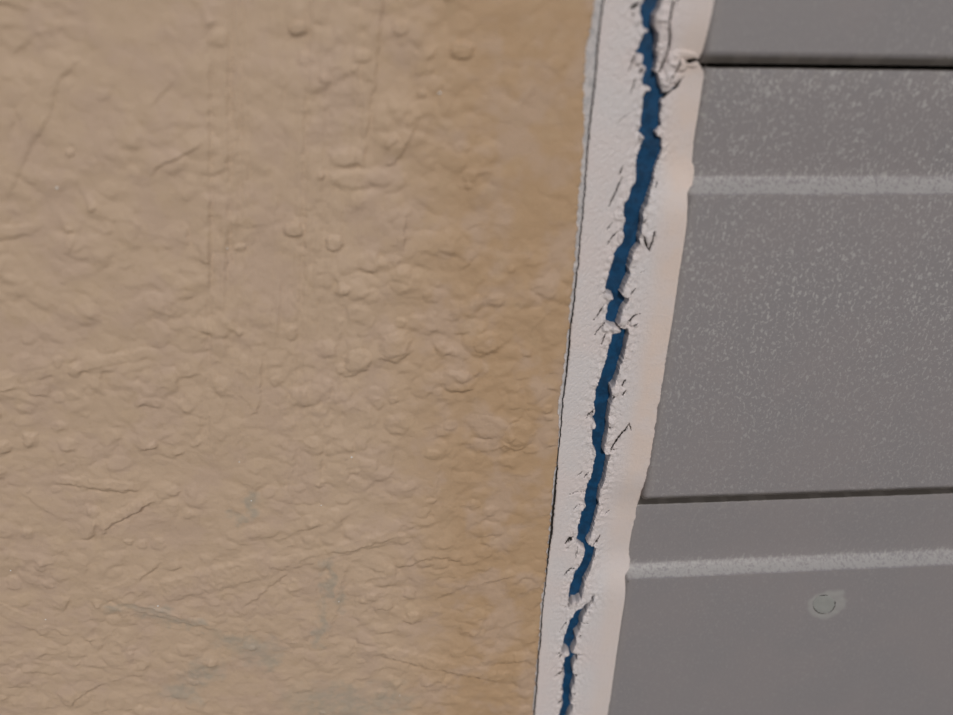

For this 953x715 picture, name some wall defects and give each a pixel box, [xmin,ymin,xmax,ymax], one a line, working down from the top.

crack [533,0,706,715]